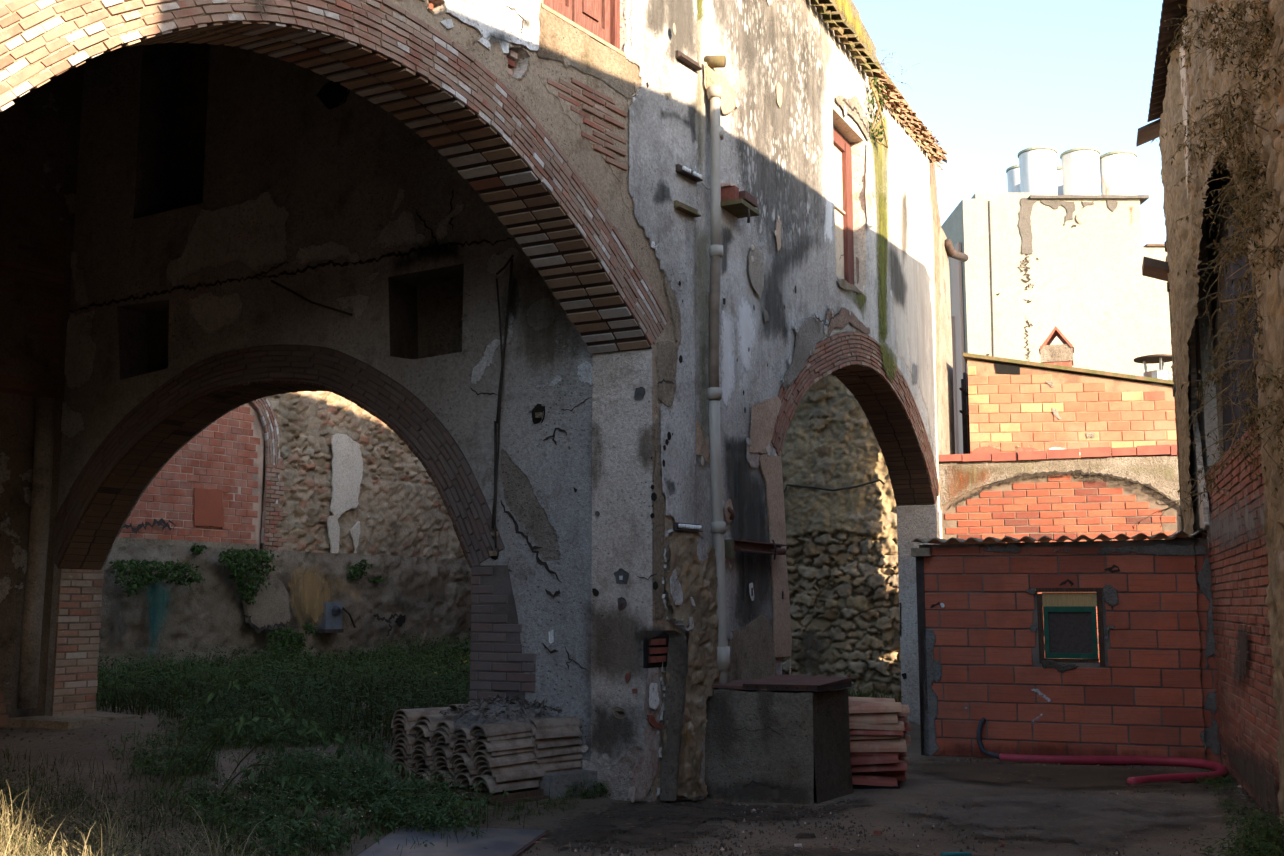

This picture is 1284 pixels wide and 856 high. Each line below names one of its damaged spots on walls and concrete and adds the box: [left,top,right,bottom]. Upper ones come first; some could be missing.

water stain [647,0,830,334]
crack [68,190,514,313]
water stain [841,195,908,334]
peeling [422,0,775,803]
spalling [743,304,870,468]
flaking render [193,488,224,527]
peeling [327,433,363,553]
crack [501,500,562,598]